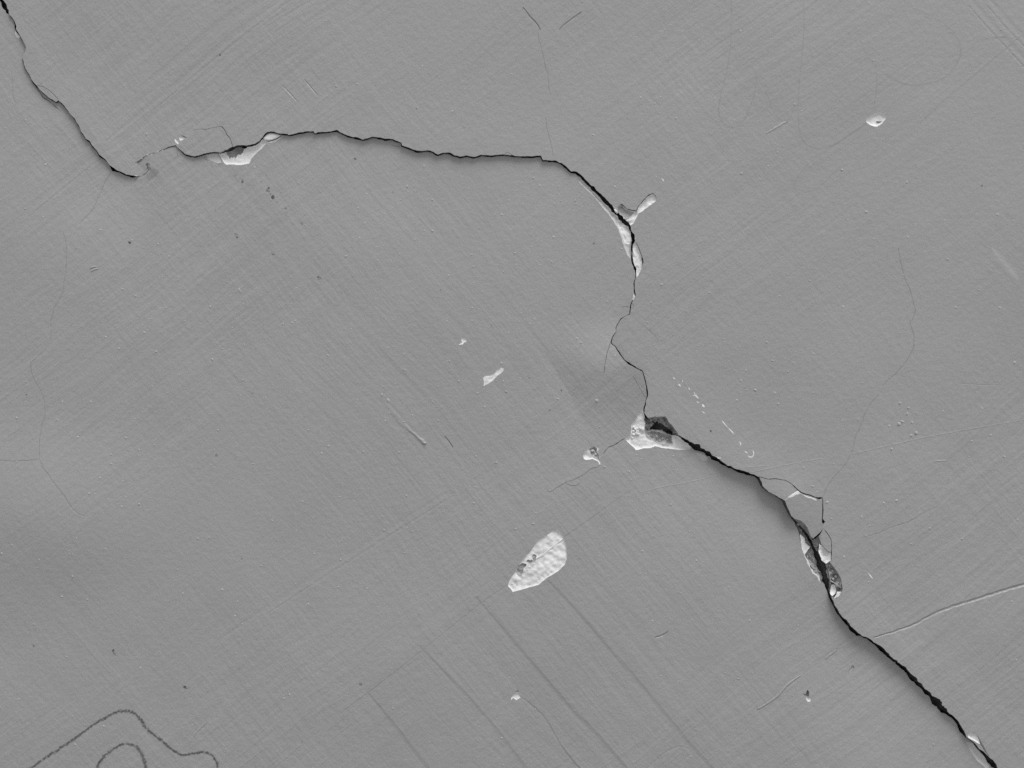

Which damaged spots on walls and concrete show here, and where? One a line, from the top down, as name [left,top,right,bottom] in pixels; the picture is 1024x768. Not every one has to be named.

crack [0,0,23,41]
flaking render [206,133,281,165]
flaking render [578,179,656,276]
crack [0,62,658,516]
flaking render [625,409,691,450]
crack [672,248,997,768]
peeling [508,530,567,592]
flaking render [795,519,843,600]